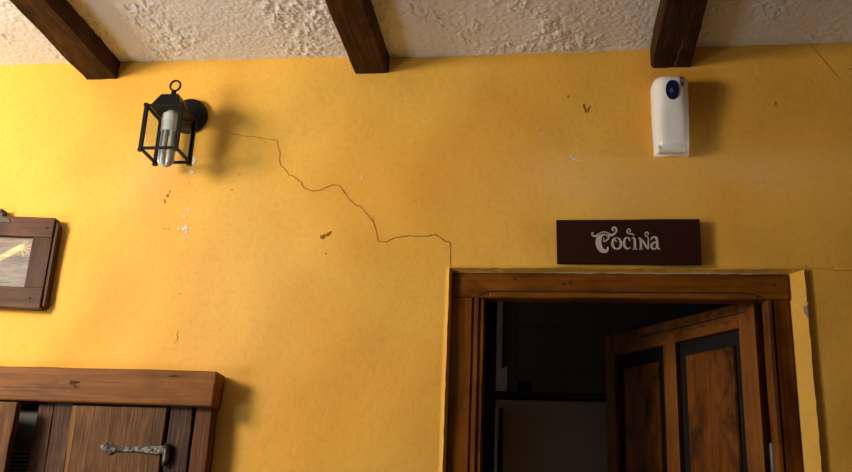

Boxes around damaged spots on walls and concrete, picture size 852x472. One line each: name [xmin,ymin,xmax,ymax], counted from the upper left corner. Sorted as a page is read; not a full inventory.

crack [219,128,452,267]